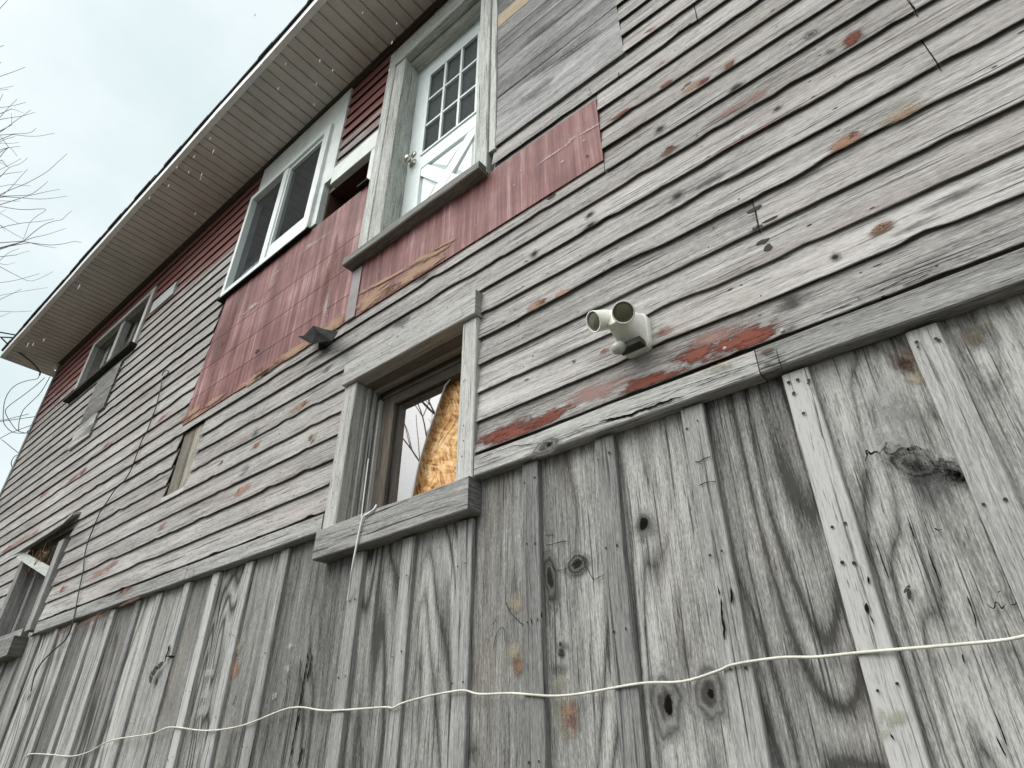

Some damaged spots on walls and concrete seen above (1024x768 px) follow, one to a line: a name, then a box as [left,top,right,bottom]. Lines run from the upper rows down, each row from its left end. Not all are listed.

peeling [358,238,455,294]
peeling [323,314,344,330]
peeling [254,341,309,380]
peeling [618,320,777,396]
peeling [475,403,576,451]
crack [477,350,786,465]
crack [865,443,956,467]